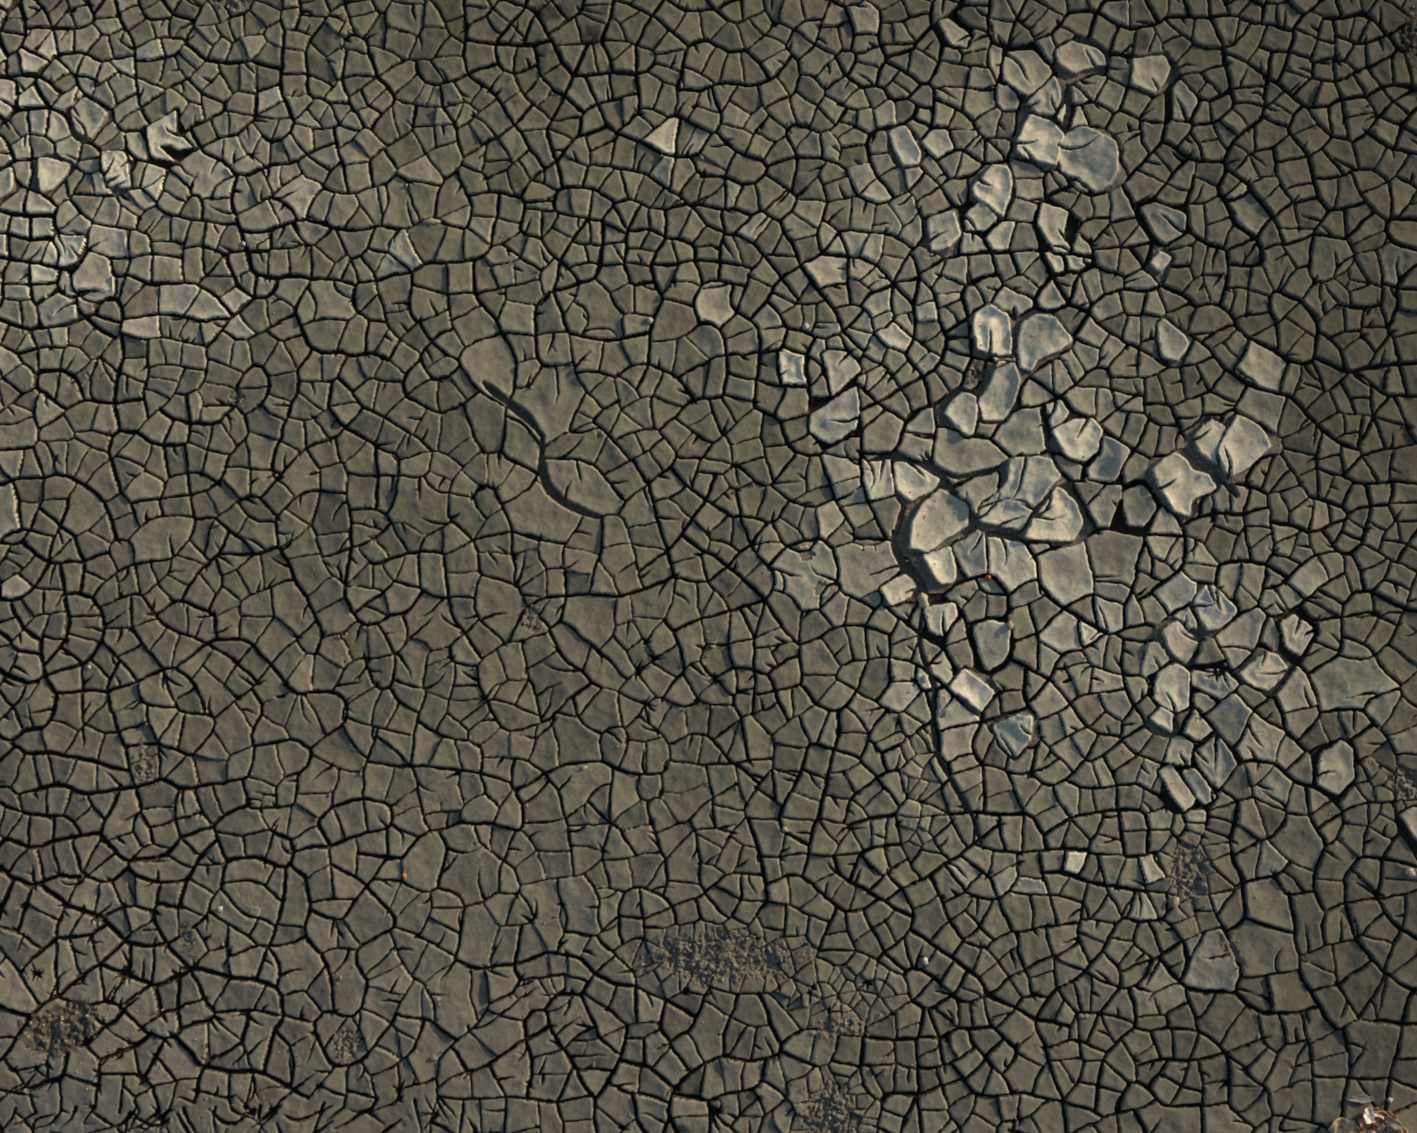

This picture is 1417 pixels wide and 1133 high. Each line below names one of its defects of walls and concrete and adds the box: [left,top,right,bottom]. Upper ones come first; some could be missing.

crack [240,139,261,163]
crack [1057,142,1090,150]
crack [836,187,855,221]
spalling [967,359,990,389]
peeling [917,592,929,609]
crack [300,760,342,804]
crack [31,968,43,979]
crack [772,962,810,994]
crack [860,971,876,989]
crack [1362,989,1417,1074]
crack [176,1107,196,1133]
crack [423,1106,454,1133]